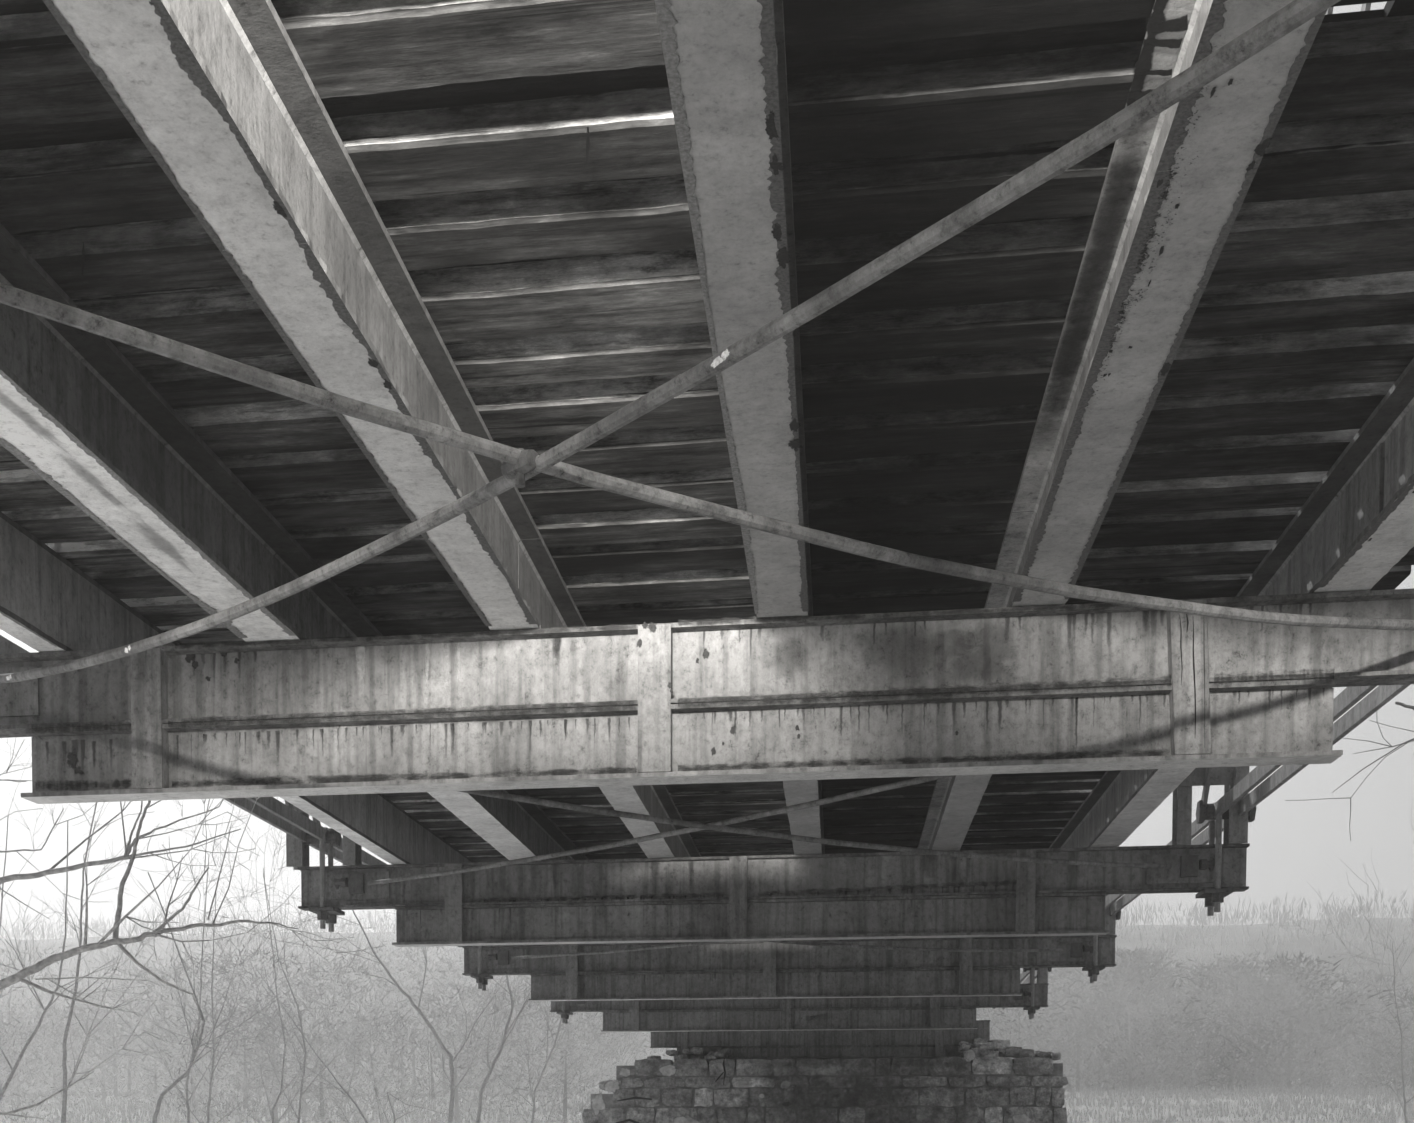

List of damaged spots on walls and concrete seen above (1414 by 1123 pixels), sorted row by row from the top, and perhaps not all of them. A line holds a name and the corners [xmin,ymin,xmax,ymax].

peeling [757,0,791,314]
peeling [783,331,809,612]
peeling [1013,79,1233,602]
peeling [1318,481,1414,588]